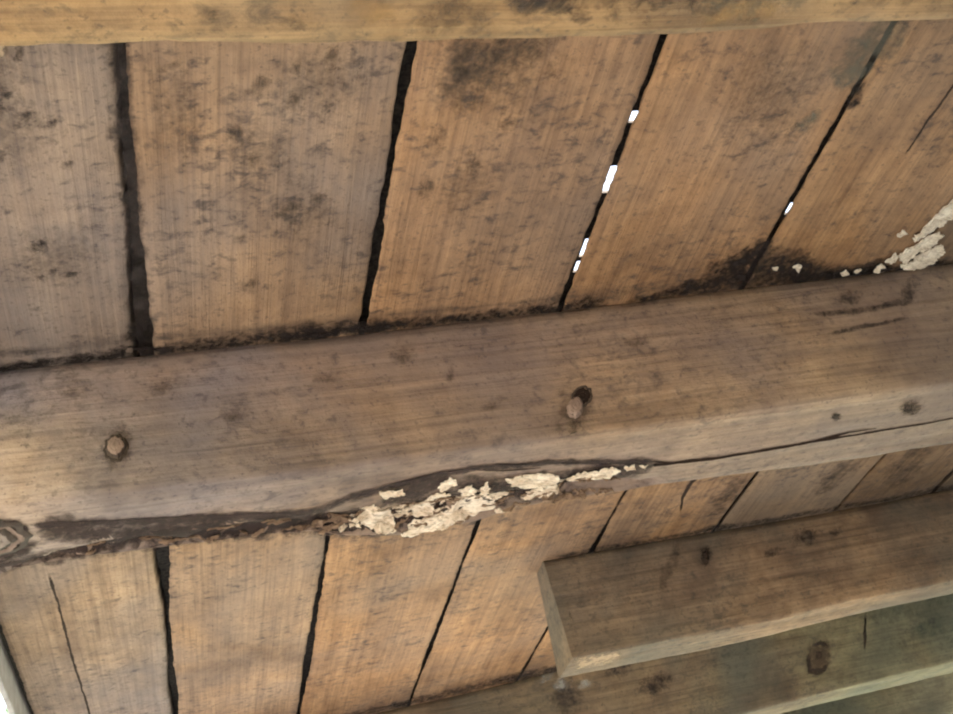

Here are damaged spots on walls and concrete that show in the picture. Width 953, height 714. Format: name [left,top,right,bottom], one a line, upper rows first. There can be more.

crack [906,85,953,153]
damp [0,38,603,372]
damp [630,240,903,303]
damp [821,284,915,316]
damp [834,318,904,333]
peeling [357,489,405,535]
crack [383,463,540,488]
peeling [410,464,648,517]
crack [650,418,953,511]
crack [49,578,90,714]